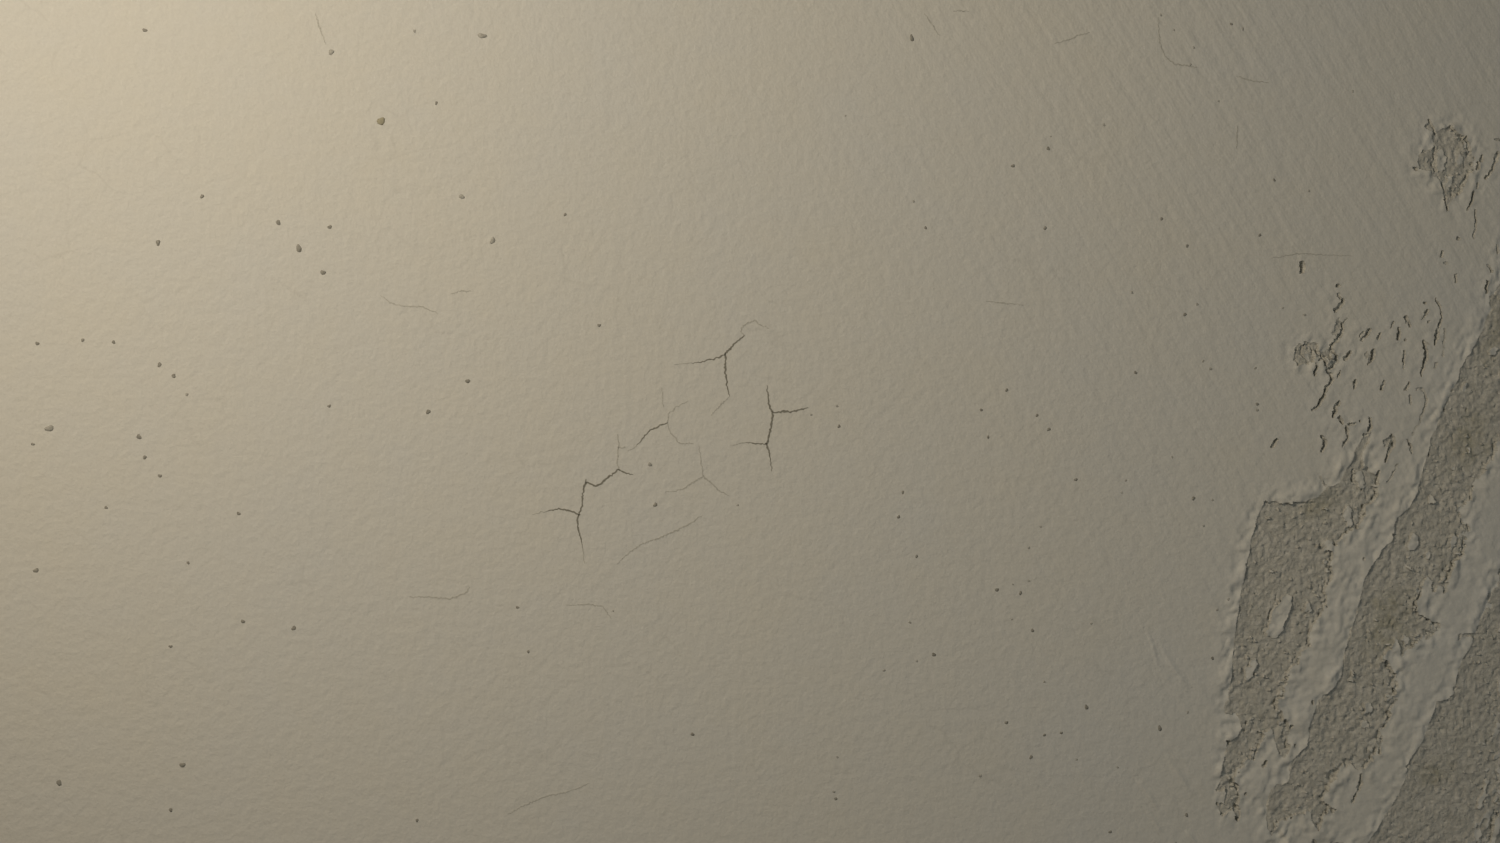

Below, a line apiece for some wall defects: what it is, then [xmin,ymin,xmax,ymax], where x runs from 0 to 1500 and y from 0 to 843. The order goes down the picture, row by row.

peeling [1412,119,1500,283]
crack [532,320,808,564]
peeling [1216,244,1500,843]